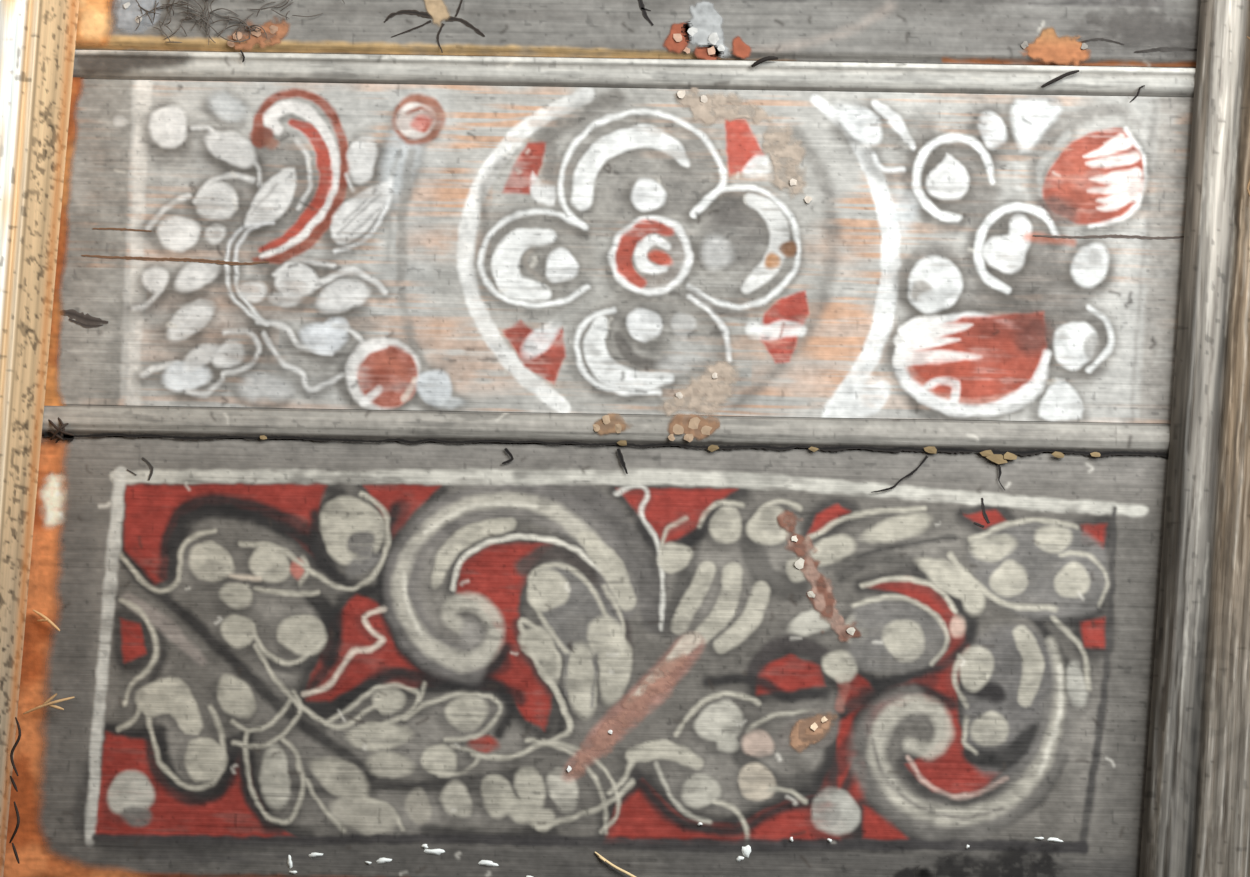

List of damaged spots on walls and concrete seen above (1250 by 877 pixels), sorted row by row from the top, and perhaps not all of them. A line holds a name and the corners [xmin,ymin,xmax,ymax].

peeling [664,1,751,60]
peeling [1021,28,1090,65]
peeling [593,413,626,435]
leakage [895,849,1056,877]